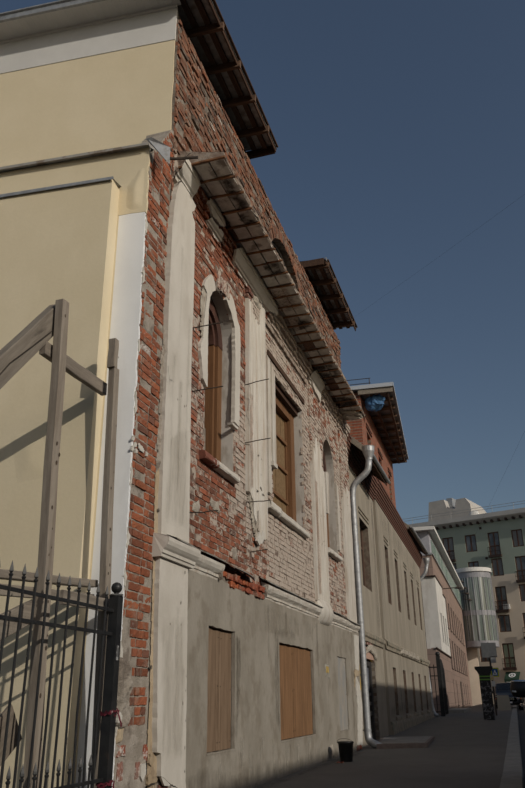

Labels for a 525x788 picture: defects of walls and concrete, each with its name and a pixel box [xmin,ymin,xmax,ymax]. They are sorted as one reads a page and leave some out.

spalling [133,323,166,533]
spalling [114,557,170,788]
flaking render [223,571,265,600]